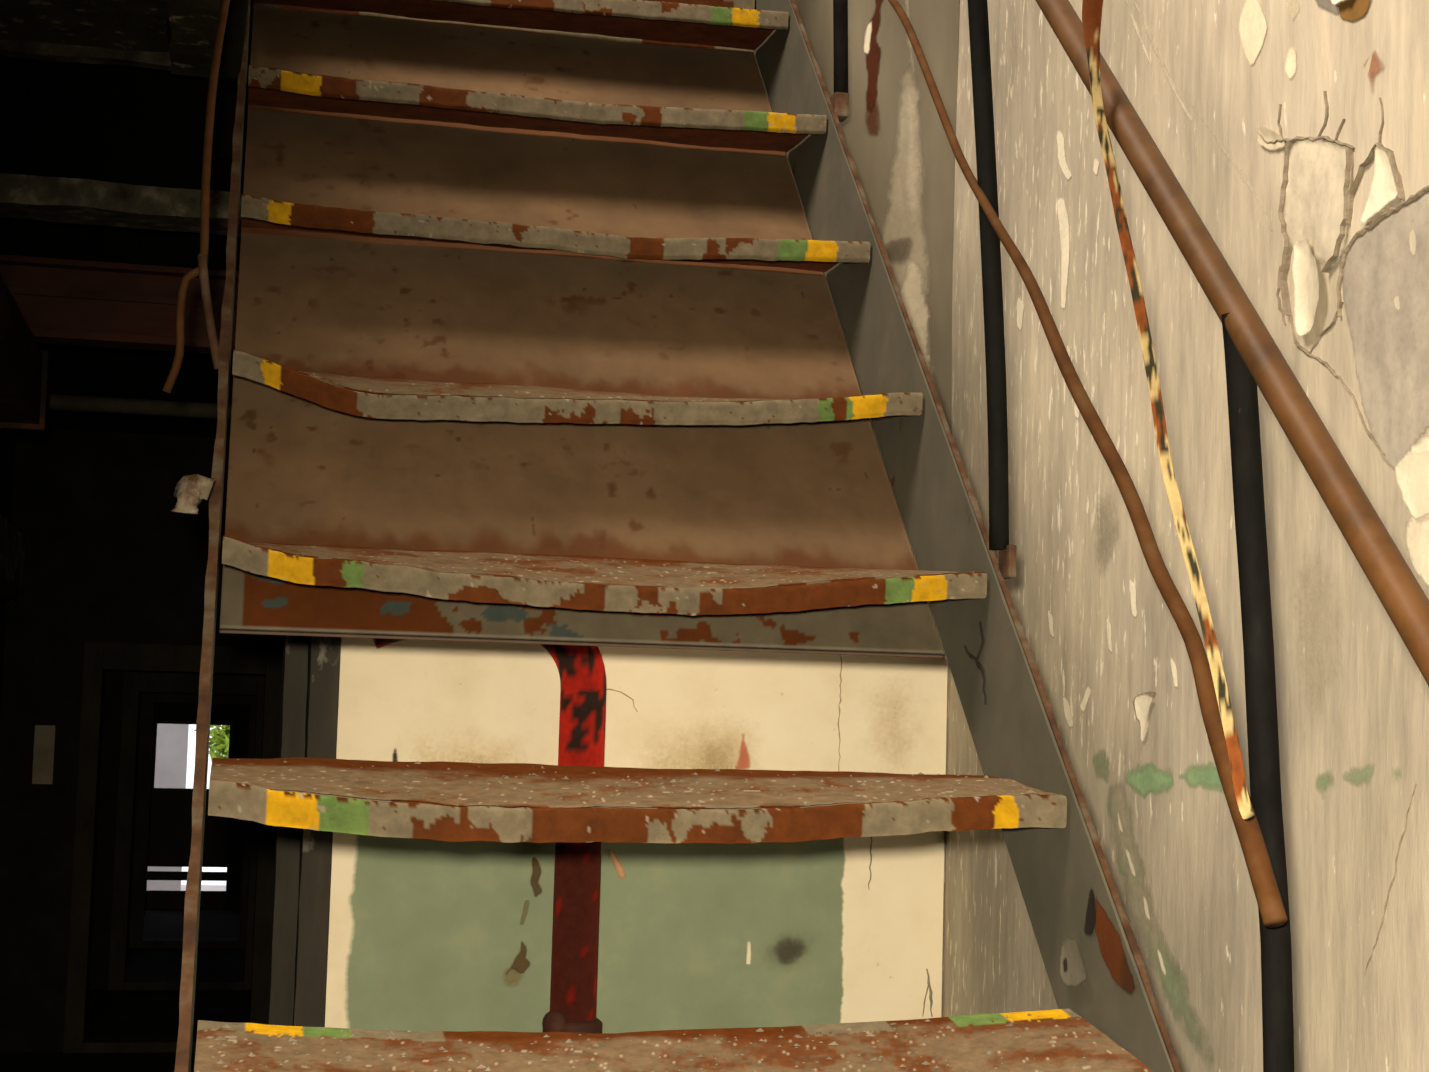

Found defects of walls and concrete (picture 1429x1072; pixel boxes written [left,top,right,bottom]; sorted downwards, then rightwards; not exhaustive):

spalling [1316,0,1372,22]
crack [1257,91,1405,224]
crack [1276,266,1385,455]
peeling [1336,147,1429,586]